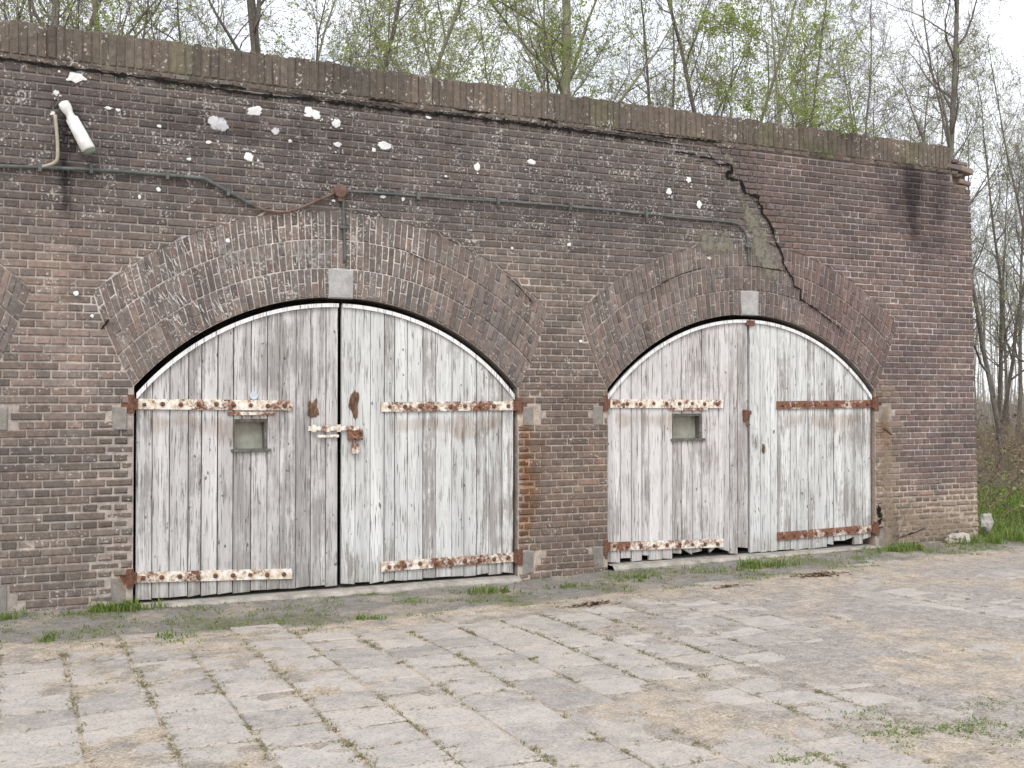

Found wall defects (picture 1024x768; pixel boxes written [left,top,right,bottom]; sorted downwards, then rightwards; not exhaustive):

crack [0,56,842,331]